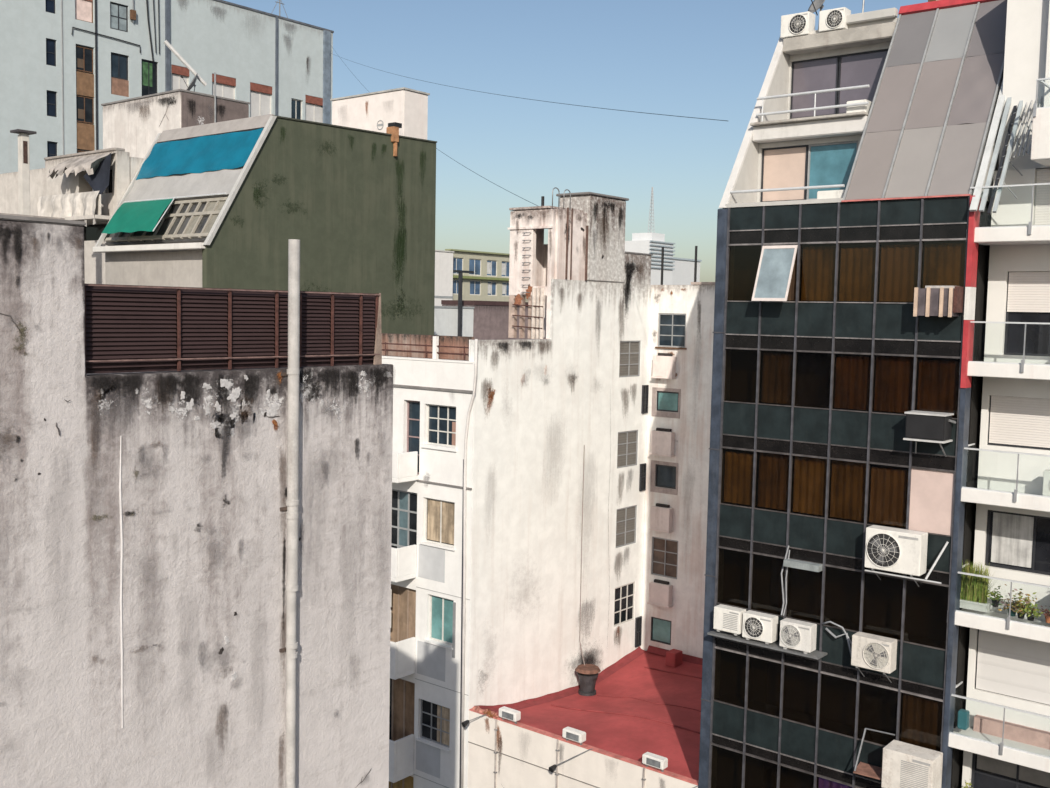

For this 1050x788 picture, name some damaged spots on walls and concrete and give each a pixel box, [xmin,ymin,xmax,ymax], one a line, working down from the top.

leakage [0,225,22,262]
leakage [594,203,623,259]
leakage [493,341,548,361]
leakage [158,373,201,407]
peeling [135,375,284,437]
leakage [218,375,229,413]
leakage [244,375,259,406]
peeling [300,372,344,422]
leakage [299,368,388,401]
peeling [359,371,393,397]
corrosion [484,384,495,407]
leakage [222,428,230,472]